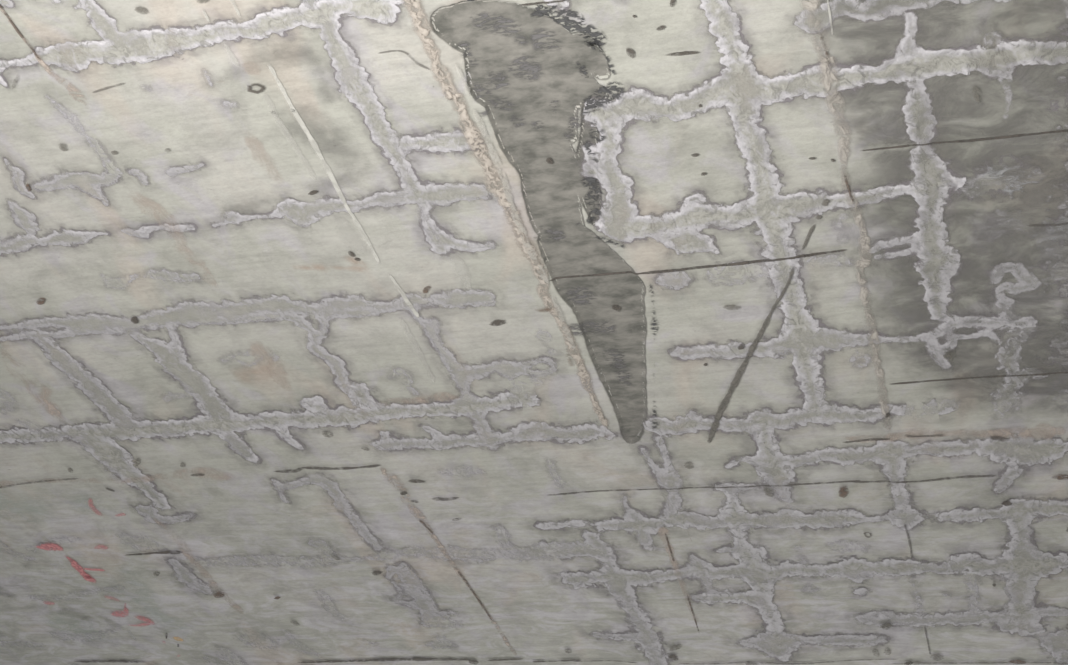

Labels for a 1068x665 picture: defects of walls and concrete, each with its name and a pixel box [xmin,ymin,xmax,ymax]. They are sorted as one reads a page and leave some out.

crack [521,0,565,8]
crack [863,129,1068,151]
crack [550,249,845,281]
leakage [414,0,1068,665]
crack [892,372,1068,385]
crack [845,435,942,443]
crack [275,465,379,473]
crack [558,475,994,495]
crack [127,549,180,557]
leakage [166,474,455,627]
crack [76,657,143,665]
crack [301,656,635,664]